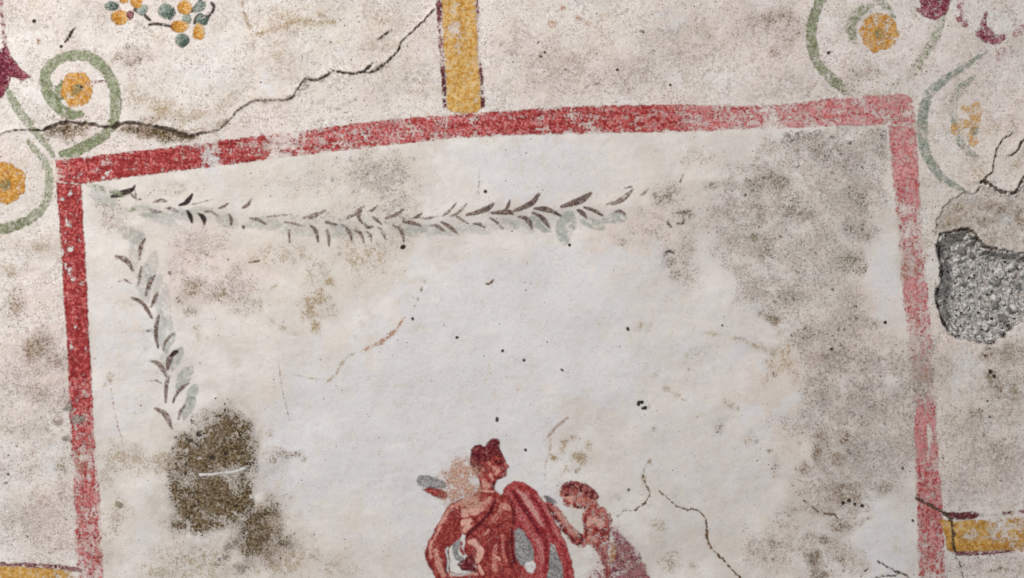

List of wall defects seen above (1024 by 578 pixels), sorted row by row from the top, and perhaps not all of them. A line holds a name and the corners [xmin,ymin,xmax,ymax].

crack [0,11,433,139]
peeling [936,155,1024,252]
crack [980,133,1024,195]
damp [166,398,305,573]
crack [616,474,741,578]
crack [916,497,963,577]